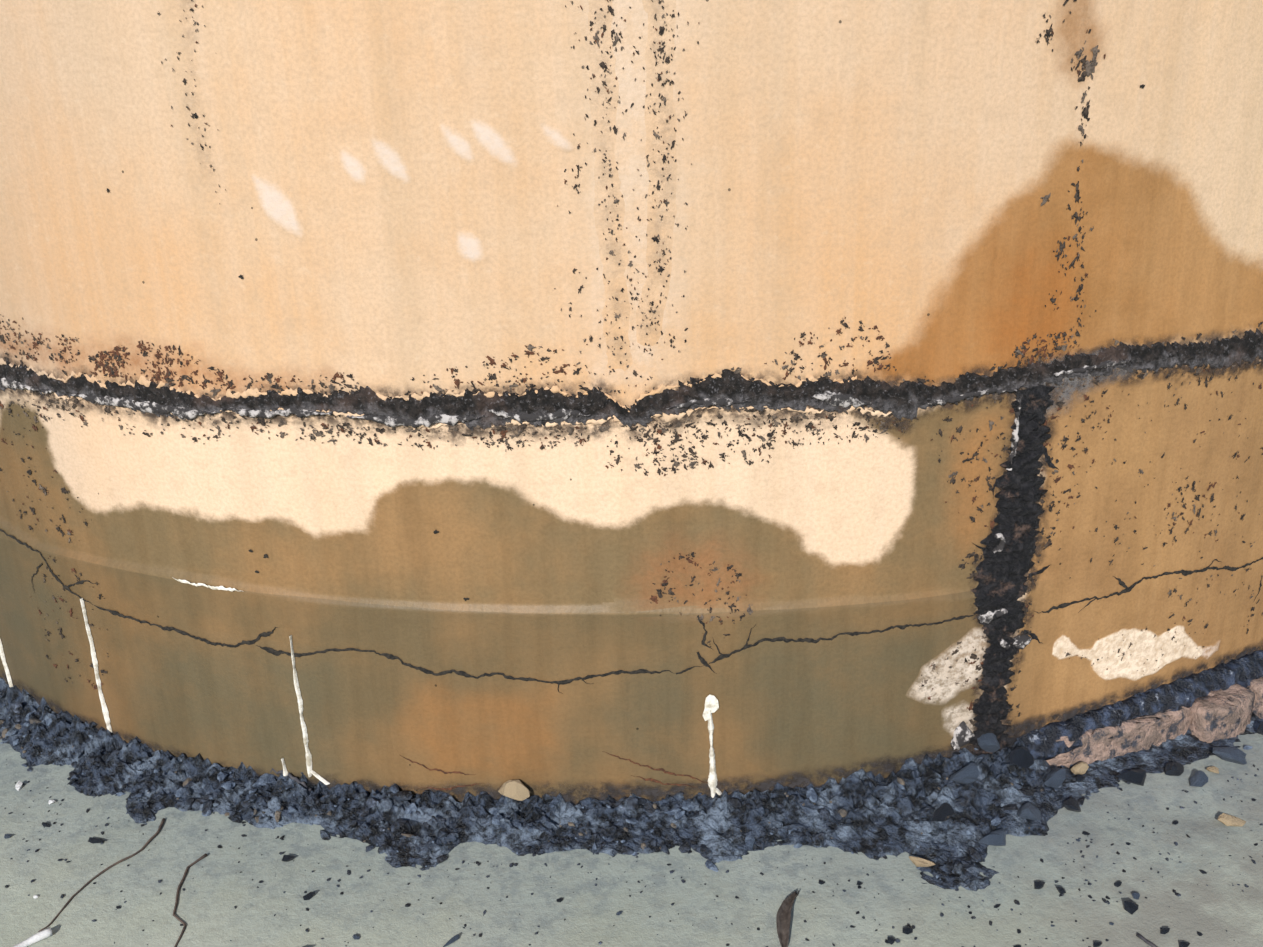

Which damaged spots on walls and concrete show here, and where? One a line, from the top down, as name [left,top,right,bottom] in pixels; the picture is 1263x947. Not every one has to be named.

damp [1033,0,1124,104]
corrosion [974,224,1095,369]
damp [834,119,1263,386]
damp [0,388,1022,804]
crack [0,322,1263,756]
damp [1000,359,1263,736]
peeling [1051,568,1263,683]